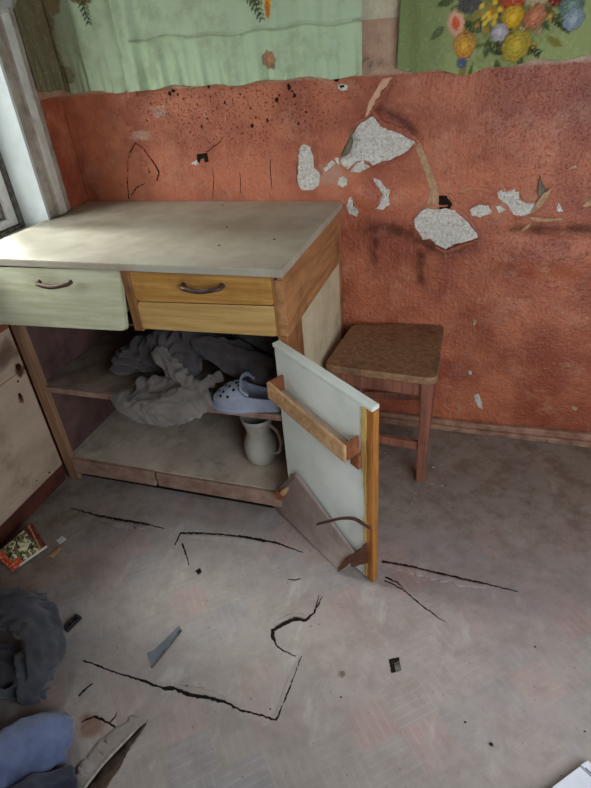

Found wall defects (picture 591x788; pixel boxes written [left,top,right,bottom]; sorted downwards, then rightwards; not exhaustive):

crack [125,143,160,199]
spalling [294,110,419,210]
spalling [346,197,361,216]
spalling [413,184,537,254]
crack [71,508,303,565]
crack [382,560,518,623]
crack [78,595,322,721]
crack [81,713,117,728]